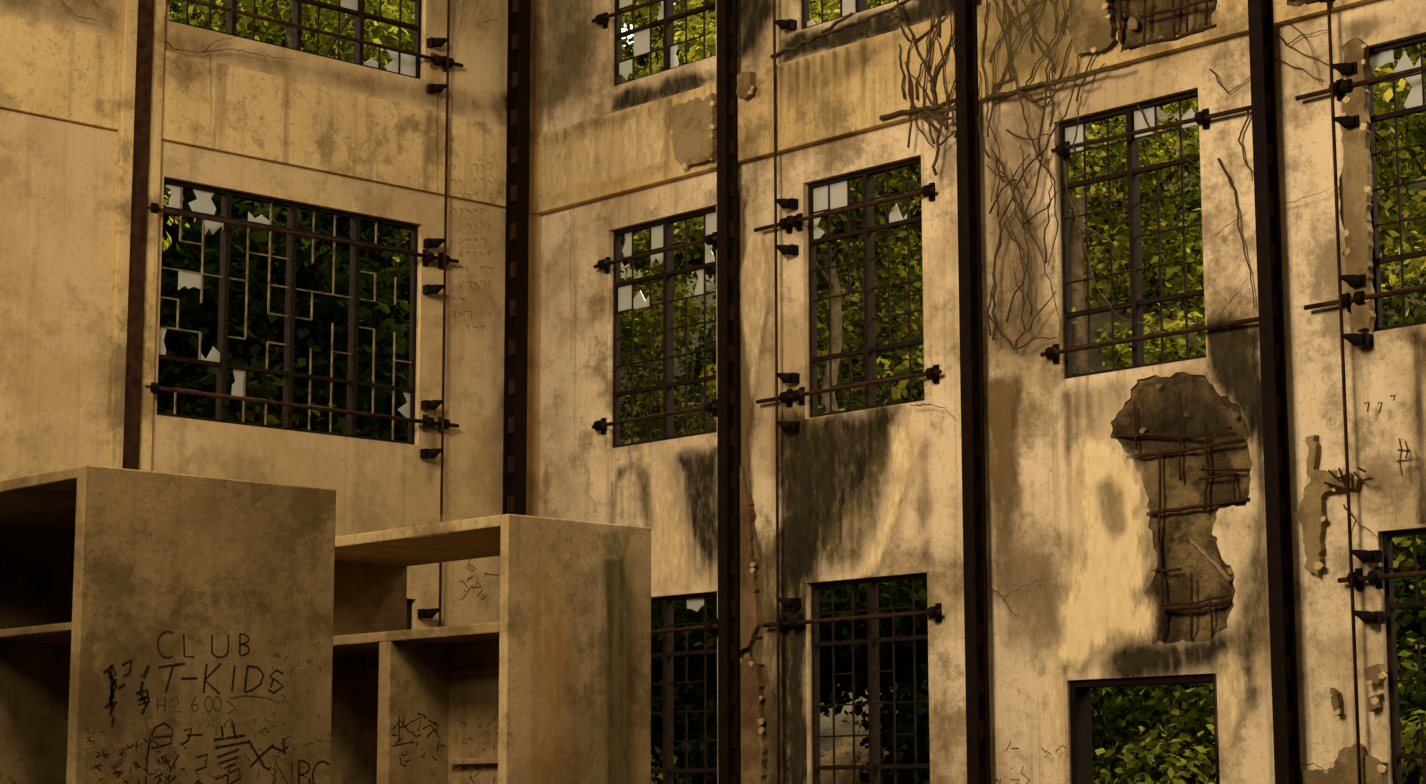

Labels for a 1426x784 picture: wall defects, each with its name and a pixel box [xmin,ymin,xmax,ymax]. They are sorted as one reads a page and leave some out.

damp [778,0,954,81]
spalling [1069,0,1217,57]
damp [738,194,766,497]
damp [1137,316,1263,457]
damp [616,449,718,583]
damp [742,405,917,784]
damp [985,376,1269,784]
spalling [1110,372,1252,645]
peeling [1294,435,1362,577]
peeling [1301,743,1389,784]